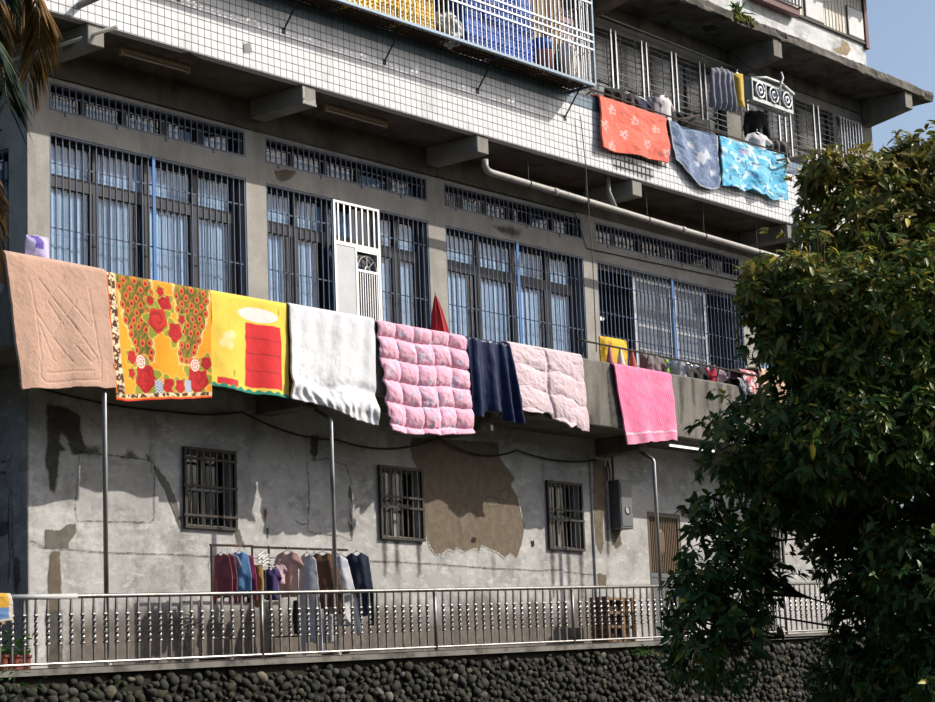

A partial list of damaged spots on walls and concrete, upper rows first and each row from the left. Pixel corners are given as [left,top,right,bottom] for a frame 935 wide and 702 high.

peeling [834,40,851,55]
crack [0,451,214,584]
crack [296,458,353,541]
peeling [410,438,535,559]